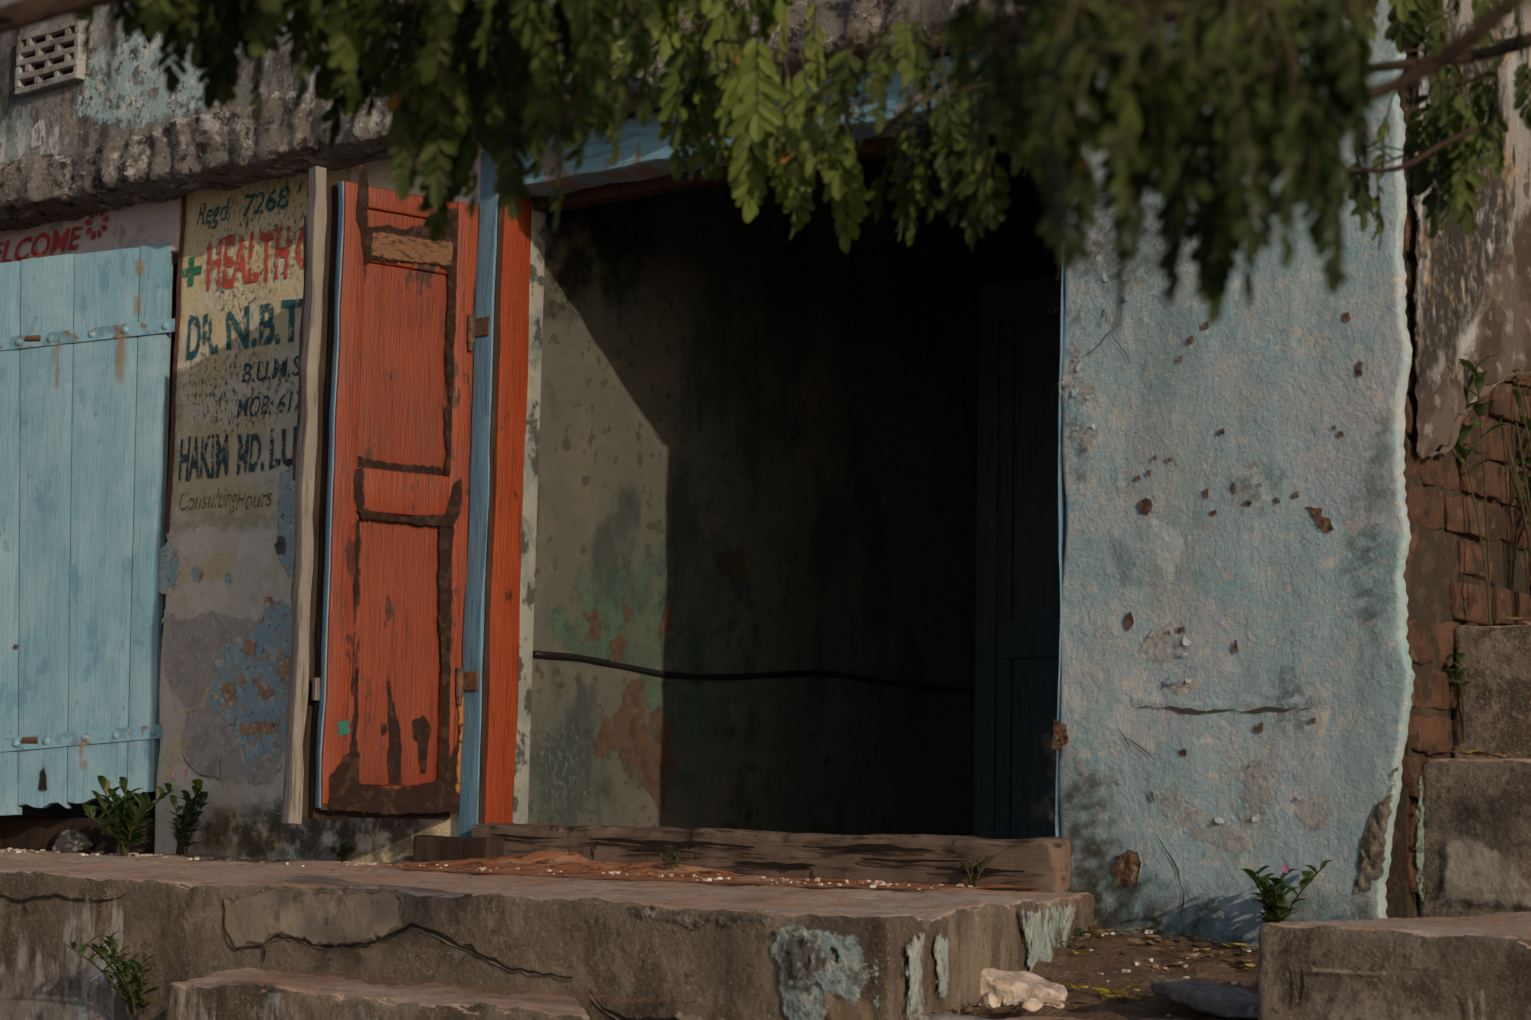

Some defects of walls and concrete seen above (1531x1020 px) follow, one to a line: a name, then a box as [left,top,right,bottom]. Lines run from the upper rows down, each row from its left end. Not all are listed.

peeling [75,24,219,133]
spalling [1176,321,1209,363]
peeling [274,466,295,577]
spalling [1274,491,1334,533]
peeling [159,540,292,814]
spalling [1111,848,1143,888]
flaking render [1442,836,1531,907]
crack [221,898,702,1020]
peeling [626,905,880,1020]